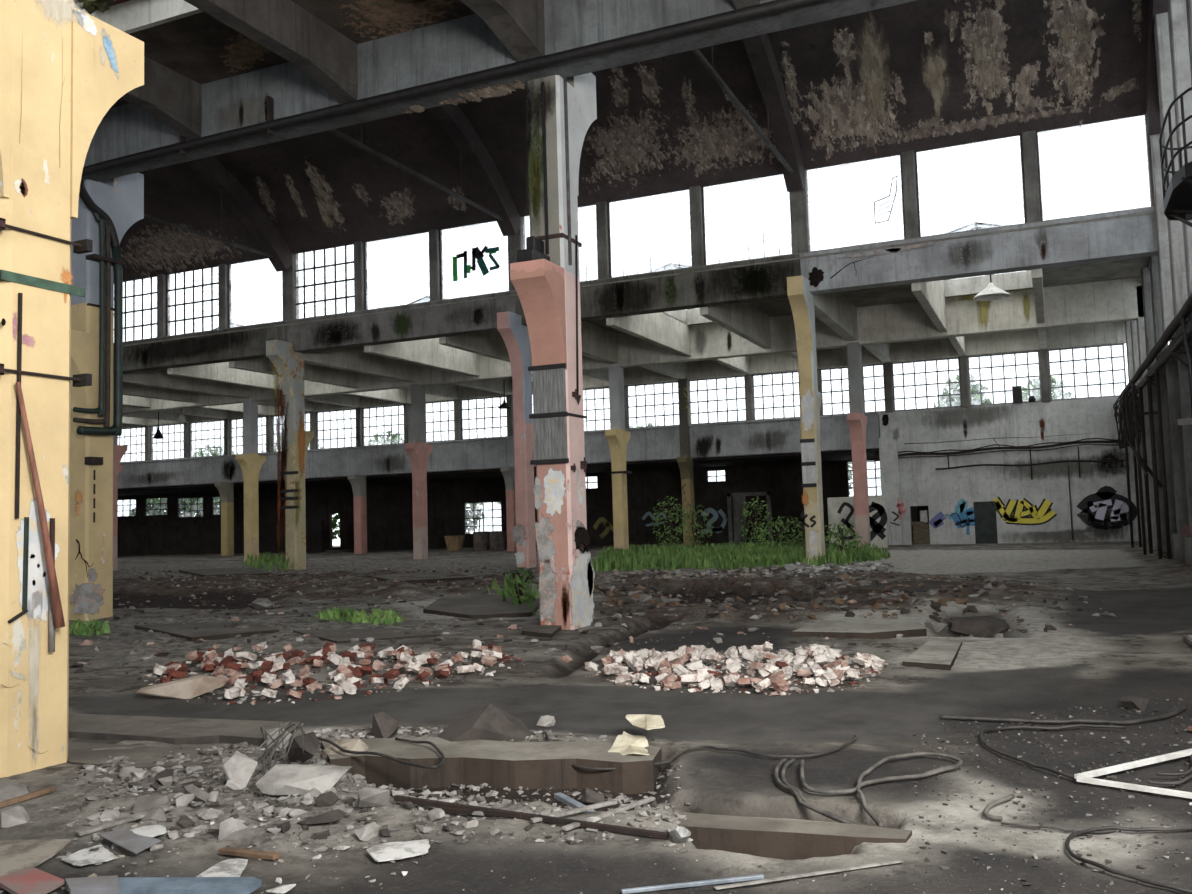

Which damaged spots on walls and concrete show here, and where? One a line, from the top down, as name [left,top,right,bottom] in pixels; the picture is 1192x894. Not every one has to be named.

peeling [40,0,98,36]
peeling [780,0,1141,161]
peeling [582,62,779,195]
peeling [120,219,253,278]
water stain [595,276,676,316]
water stain [694,263,796,304]
rust [273,366,305,549]
peeling [16,499,60,622]
crack [75,539,94,578]
peeling [512,467,595,628]
peeling [70,568,105,615]